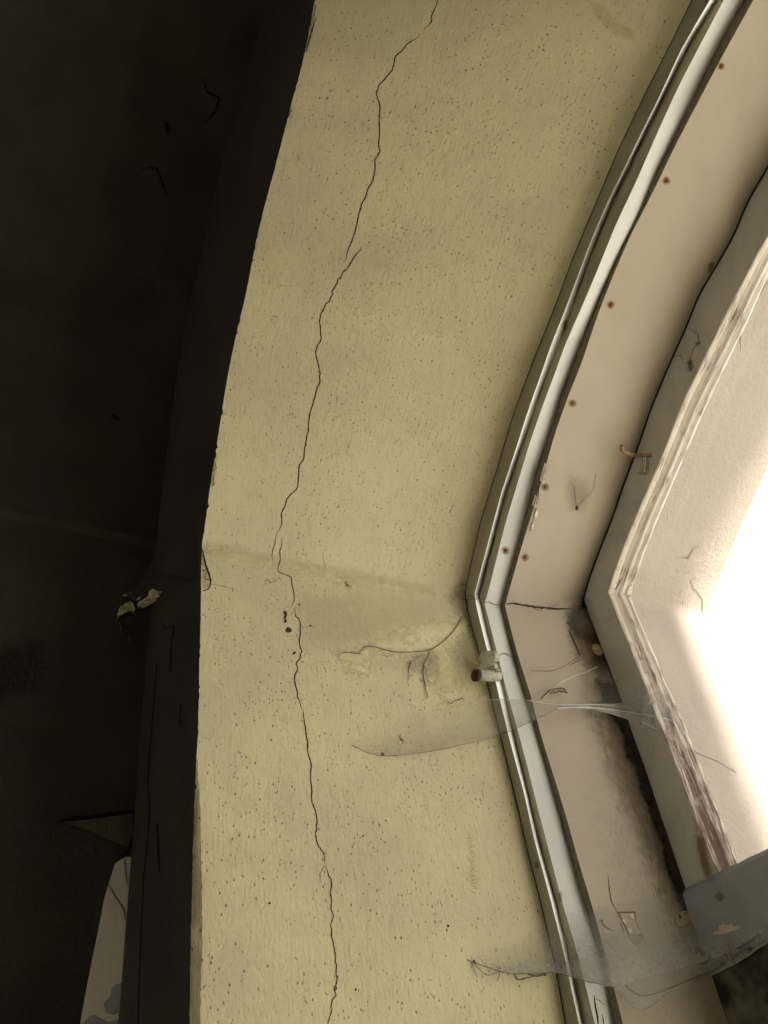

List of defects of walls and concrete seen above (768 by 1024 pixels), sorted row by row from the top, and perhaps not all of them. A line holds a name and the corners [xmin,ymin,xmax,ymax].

crack [264,0,438,1023]
flaking render [116,589,163,643]
crack [340,616,463,704]
peeling [338,618,486,706]